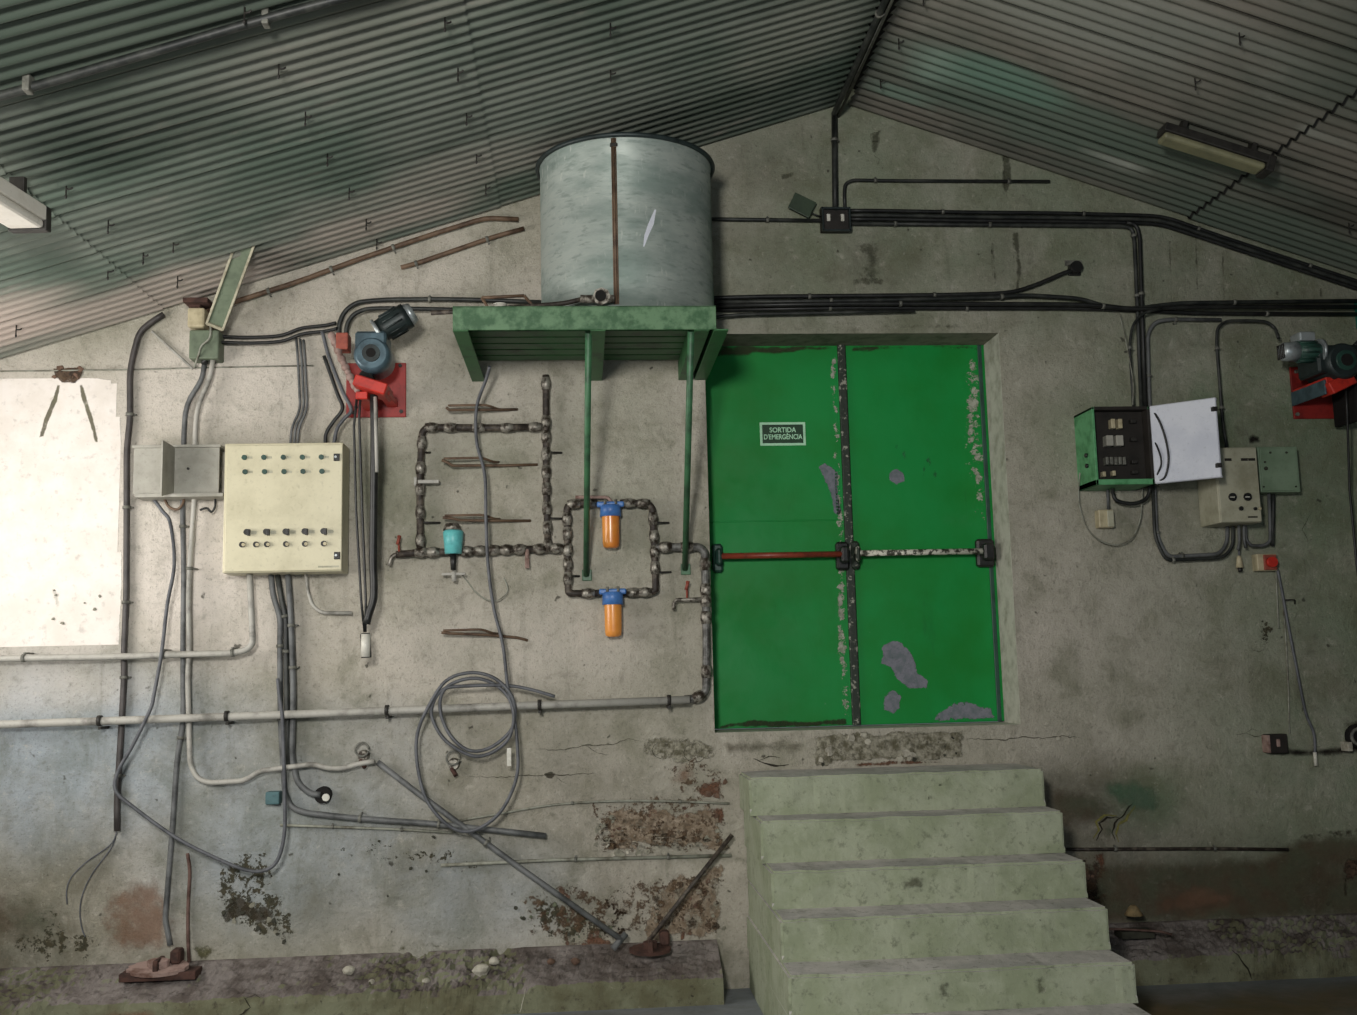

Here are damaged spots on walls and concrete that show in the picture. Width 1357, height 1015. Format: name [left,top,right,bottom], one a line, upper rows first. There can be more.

peeling [819,463,841,514]
peeling [881,641,928,713]
spalling [814,702,994,767]
flaking render [514,796,729,942]
damp [1085,831,1357,921]